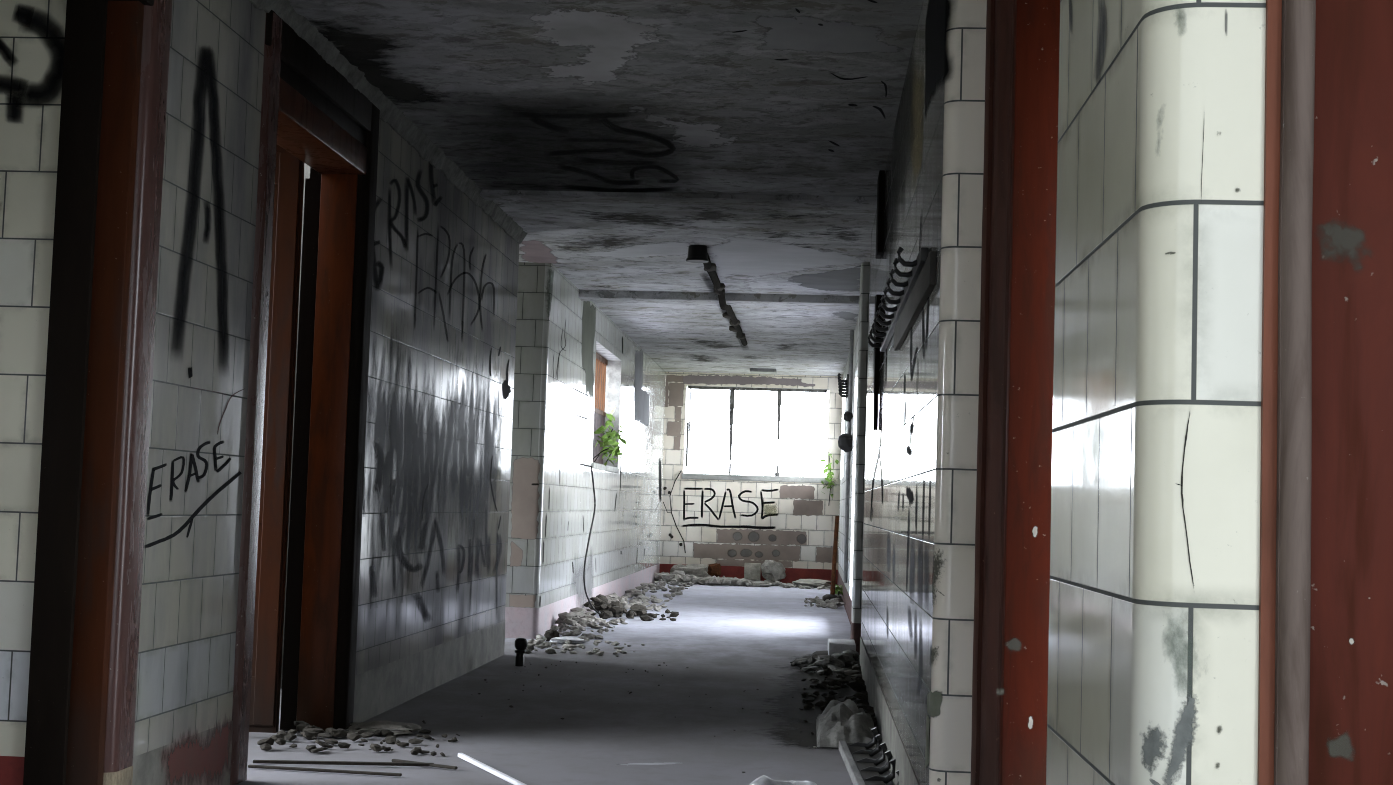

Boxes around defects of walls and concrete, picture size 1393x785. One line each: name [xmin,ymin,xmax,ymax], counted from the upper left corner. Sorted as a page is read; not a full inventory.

peeling [530,2,659,86]
crack [1198,129,1206,197]
crack [1177,413,1194,587]
peeling [161,721,232,785]